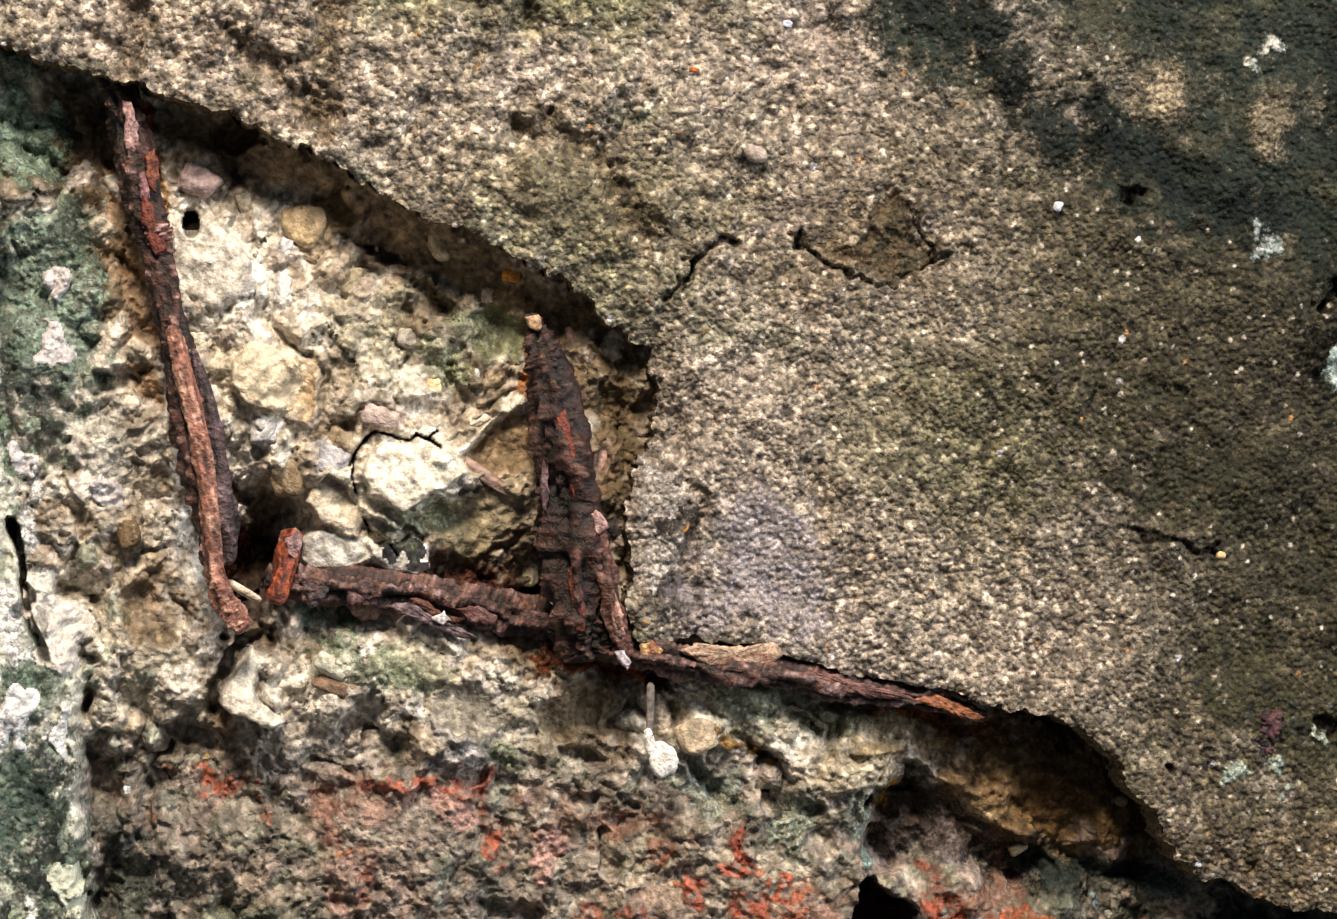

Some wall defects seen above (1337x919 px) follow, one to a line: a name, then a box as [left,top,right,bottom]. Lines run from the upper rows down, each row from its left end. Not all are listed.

water stain [1318,14,1337,154]
water stain [885,0,1299,263]
crack [793,231,885,288]
crack [917,207,946,259]
spalling [0,49,988,722]
water stain [1320,346,1337,393]
crack [6,517,39,638]
rust [224,519,252,576]
rust [441,564,528,594]
rust [519,640,675,693]
flaking render [190,761,273,827]
flaking render [307,765,505,919]